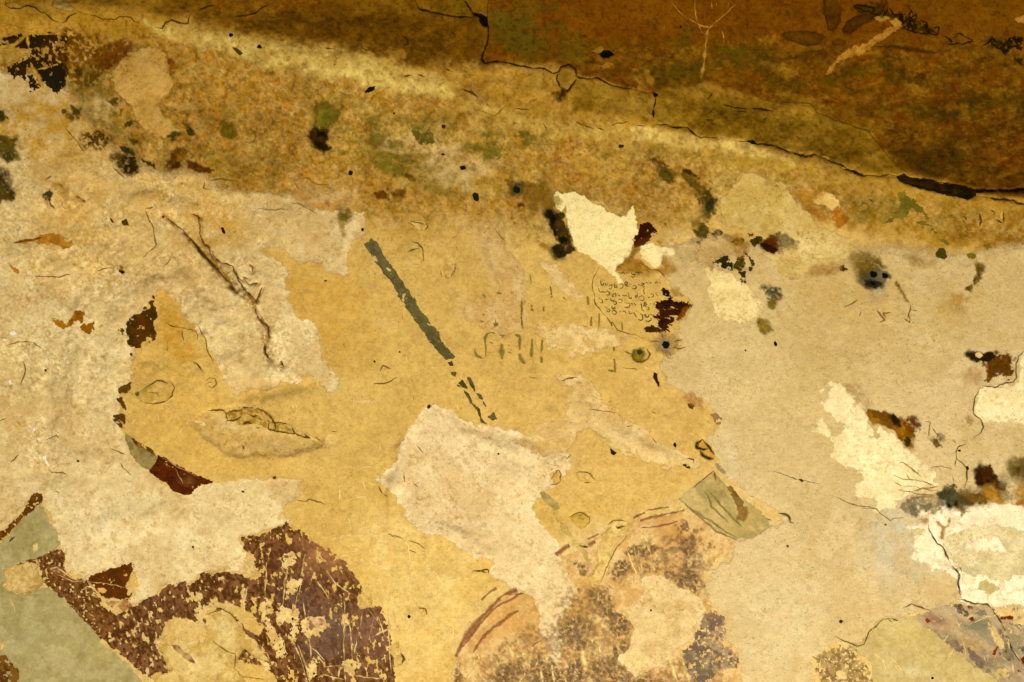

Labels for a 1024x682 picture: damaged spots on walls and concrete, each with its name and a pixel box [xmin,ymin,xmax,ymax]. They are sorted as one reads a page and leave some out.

water stain [852,2,1023,65]
water stain [412,130,435,144]
water stain [462,133,502,159]
crack [403,0,1024,227]
mould [510,182,575,260]
crack [144,207,284,367]
crack [167,323,217,388]
flaking render [0,26,405,682]
rust [965,351,1016,382]
flaking render [375,191,1024,682]
rust [845,385,921,448]
crack [955,352,1023,485]